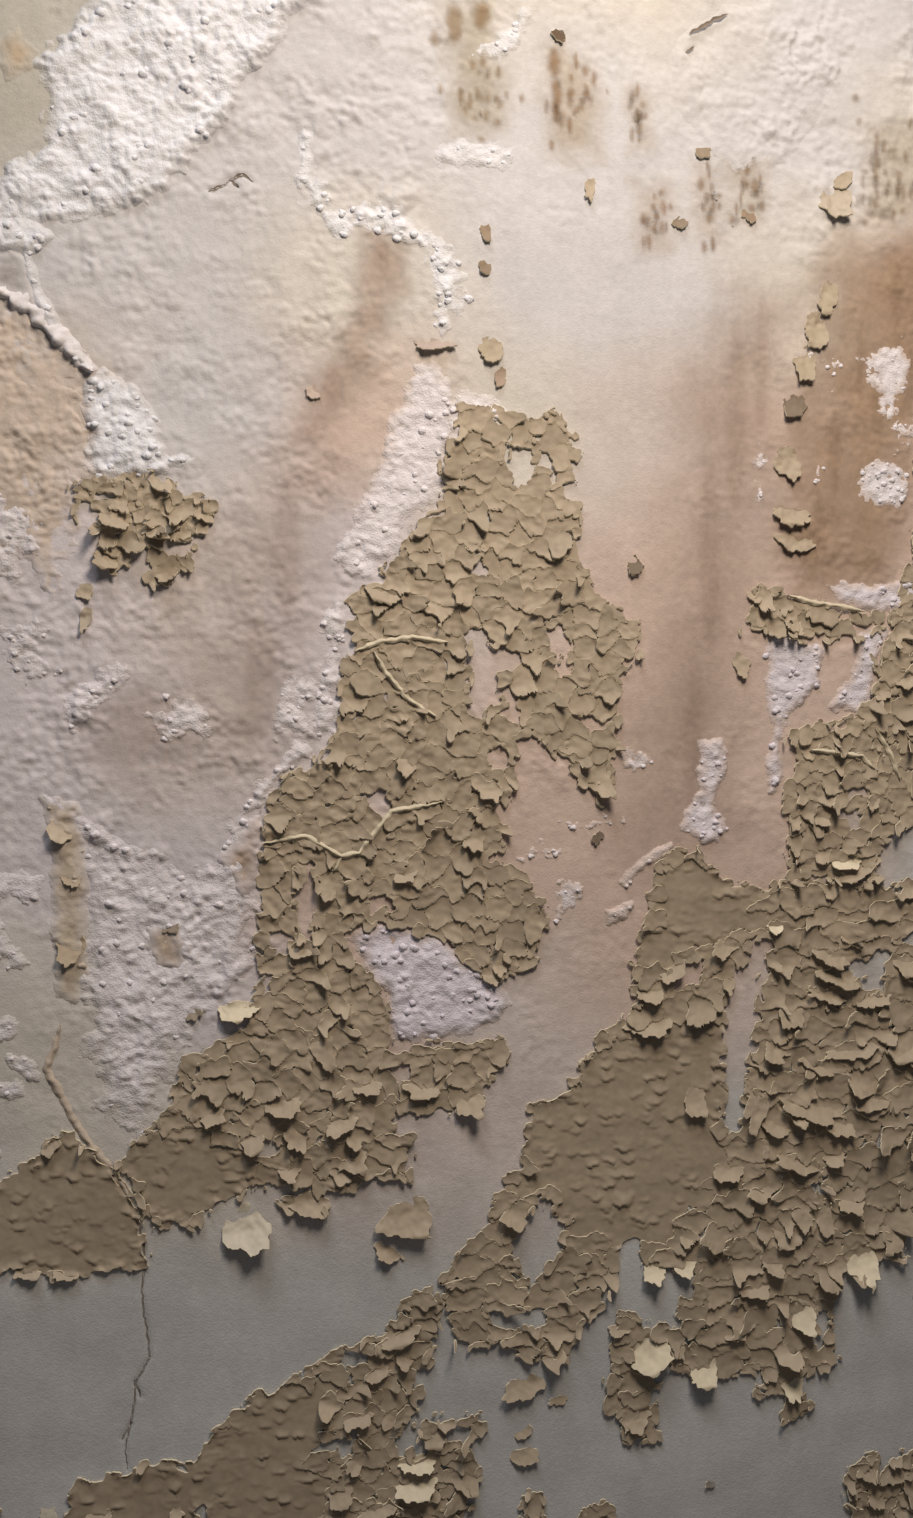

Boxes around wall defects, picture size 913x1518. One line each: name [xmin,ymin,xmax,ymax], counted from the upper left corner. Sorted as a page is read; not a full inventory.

leakage [0,0,308,325]
spalling [0,250,219,634]
leakage [57,341,197,481]
leakage [290,125,516,579]
peeling [773,445,802,482]
peeling [773,505,816,553]
leakage [808,337,913,512]
leakage [78,602,347,1150]
peeling [0,336,645,1284]
leakage [345,922,513,1045]
peeling [39,528,913,1518]
crack [122,1227,151,1469]